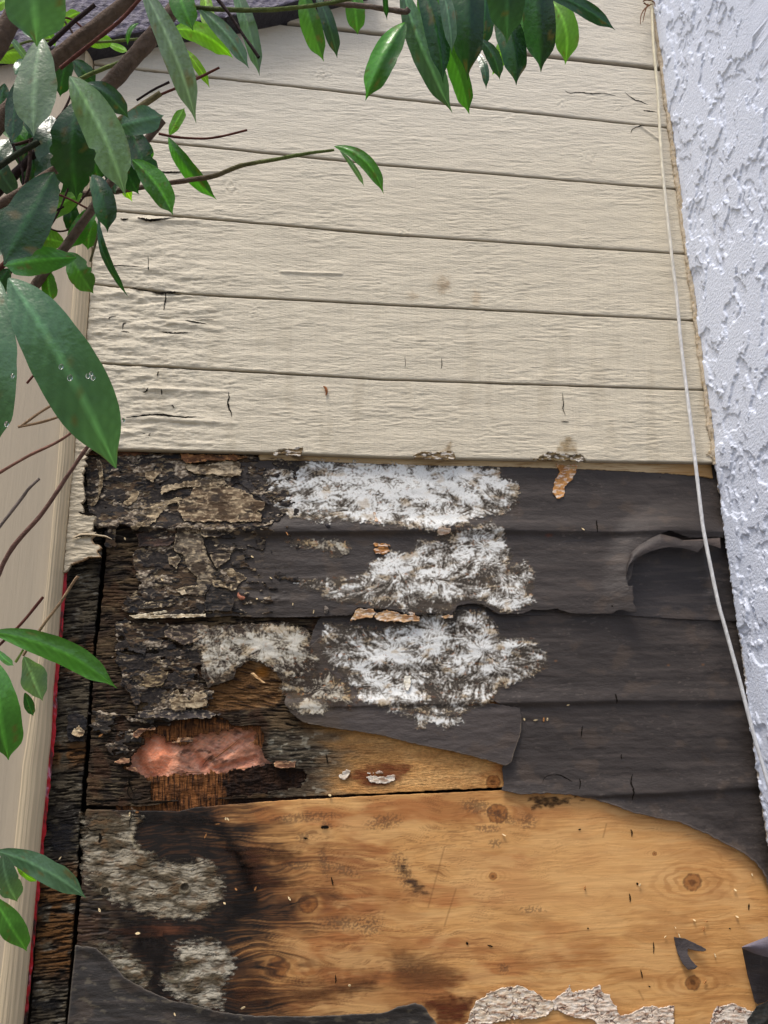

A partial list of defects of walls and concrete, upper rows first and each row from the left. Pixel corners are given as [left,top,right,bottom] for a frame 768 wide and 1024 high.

peeling [88,451,104,506]
spalling [413,450,456,461]
peeling [117,452,311,721]
leakage [179,459,547,730]
peeling [366,771,395,784]
leakage [131,812,295,930]
peeling [466,985,674,1024]
peeling [710,1003,753,1024]